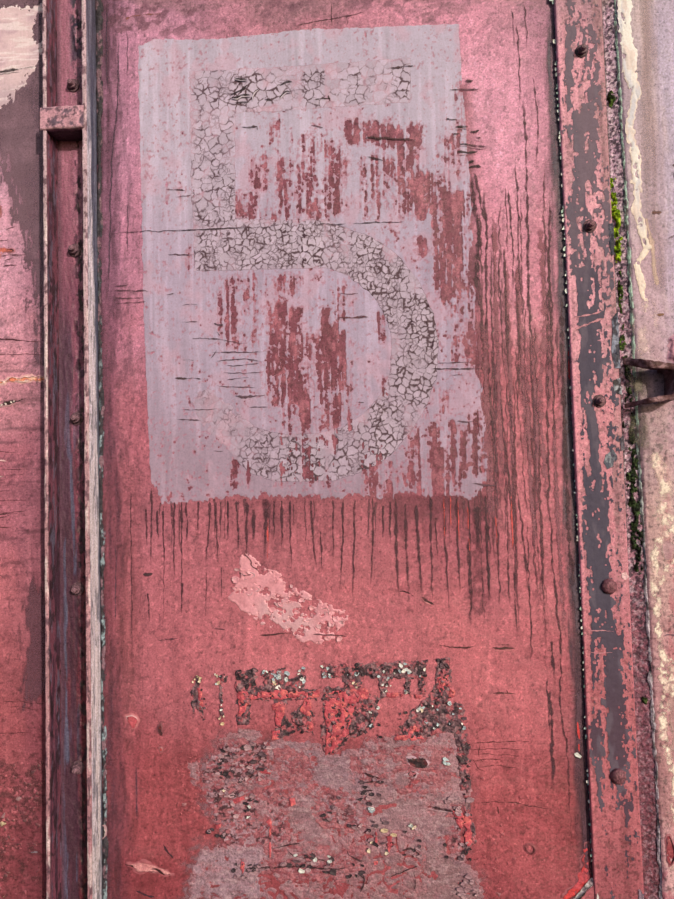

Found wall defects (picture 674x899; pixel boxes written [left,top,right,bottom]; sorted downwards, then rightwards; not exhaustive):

water stain [512,6,528,91]
crack [115,58,479,482]
water stain [367,79,580,786]
peeling [559,0,639,878]
water stain [145,488,356,603]
peeling [228,553,349,644]
peeling [190,675,207,721]
peeling [205,657,477,861]
peeling [231,863,262,879]
peeling [279,853,366,879]